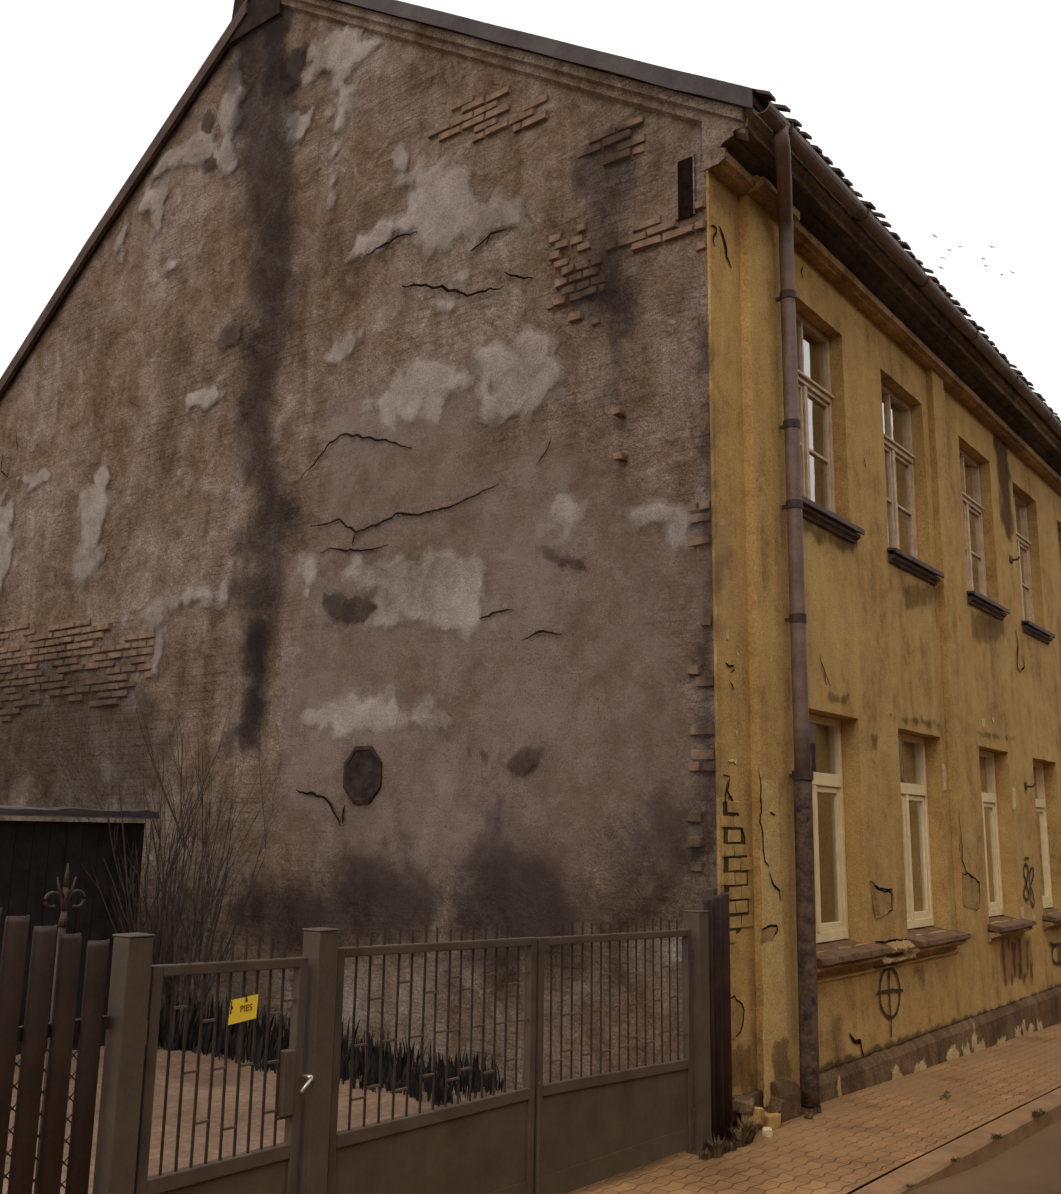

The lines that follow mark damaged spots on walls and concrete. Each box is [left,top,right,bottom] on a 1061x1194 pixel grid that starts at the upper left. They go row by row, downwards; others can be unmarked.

leakage [234,12,290,325]
crack [711,225,732,268]
crack [402,272,533,297]
crack [301,433,412,478]
crack [310,484,499,553]
crack [296,789,345,826]
flaking render [705,801,778,943]
flaking render [870,881,893,919]
flaking render [962,872,980,910]
flaking render [731,995,745,1039]
flaking render [946,1019,1043,1061]
flaking render [891,1059,927,1080]